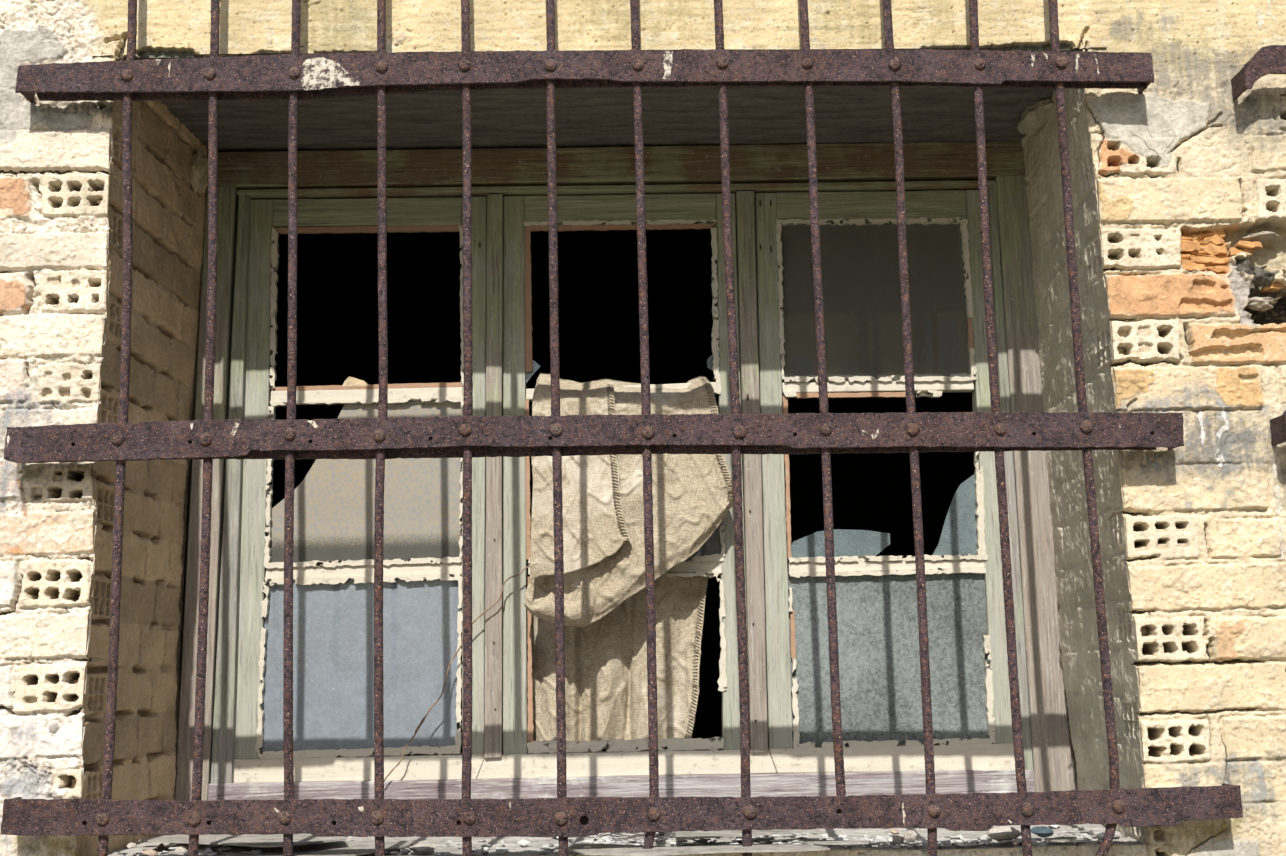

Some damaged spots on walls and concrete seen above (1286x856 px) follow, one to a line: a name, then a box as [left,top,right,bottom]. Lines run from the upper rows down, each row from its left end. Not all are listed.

peeling [0,279,30,315]
spalling [1106,216,1286,410]